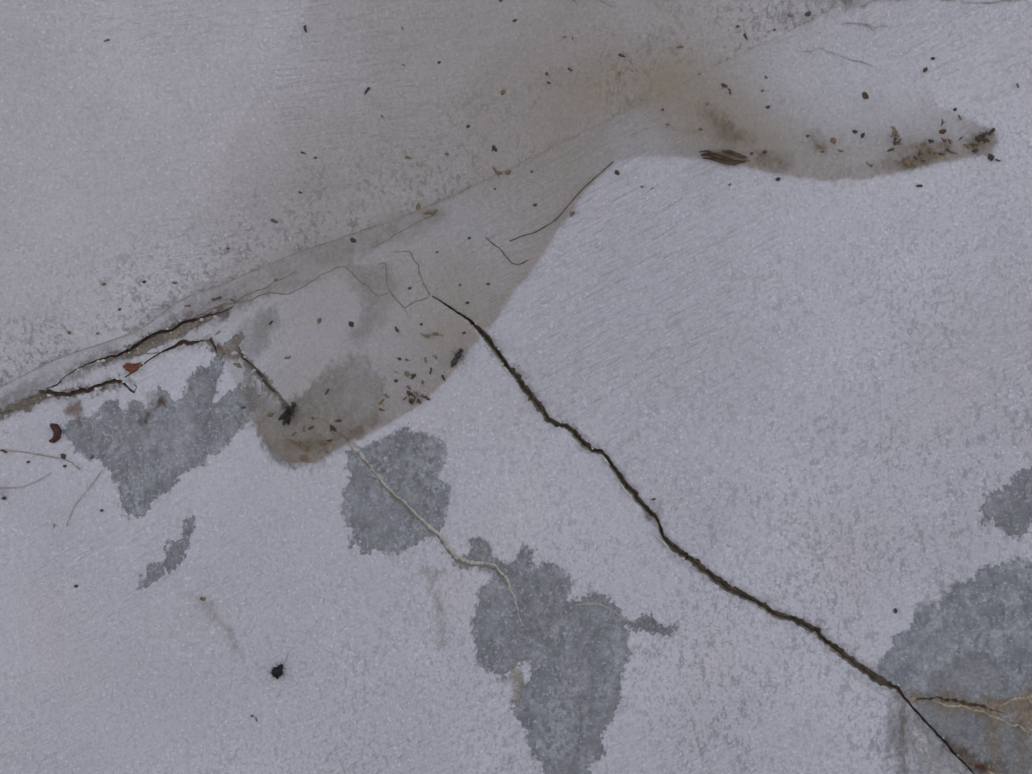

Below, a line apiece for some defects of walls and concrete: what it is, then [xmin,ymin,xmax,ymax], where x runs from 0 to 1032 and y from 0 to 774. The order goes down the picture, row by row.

spalling [123,362,141,373]
crack [0,216,975,774]
water stain [878,558,1032,774]